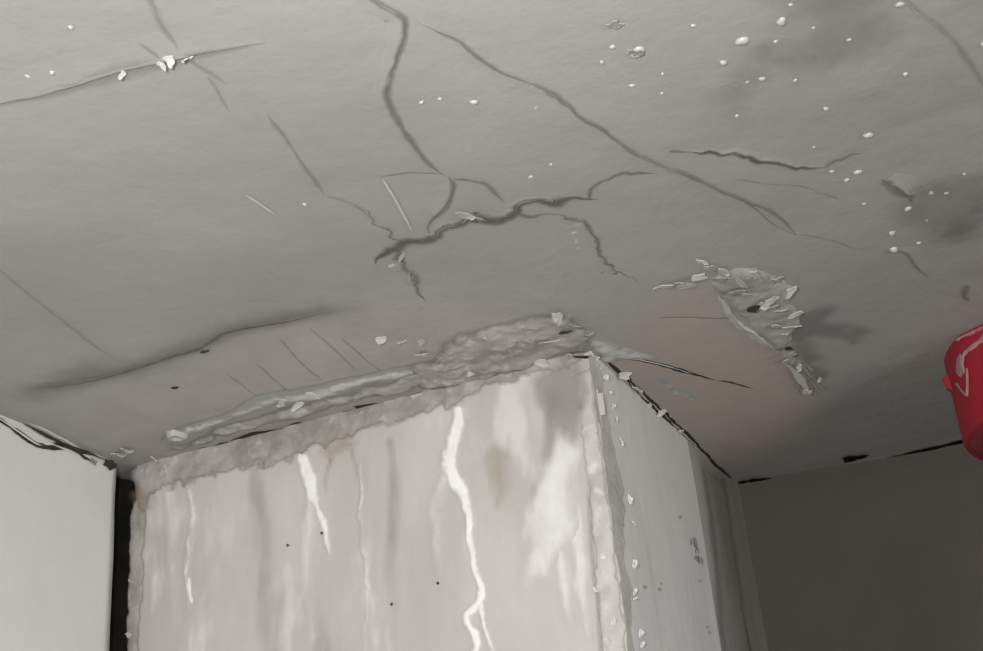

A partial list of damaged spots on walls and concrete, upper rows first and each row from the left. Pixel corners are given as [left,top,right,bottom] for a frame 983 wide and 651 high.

crack [151,0,193,71]
crack [854,0,983,100]
crack [355,0,861,300]
crack [879,173,925,202]
crack [0,415,105,461]
damp [160,485,199,637]
peeling [276,392,320,412]
damp [294,450,335,651]
damp [423,402,498,651]
damp [508,389,605,642]
flaking render [375,249,876,651]
crack [599,355,731,478]